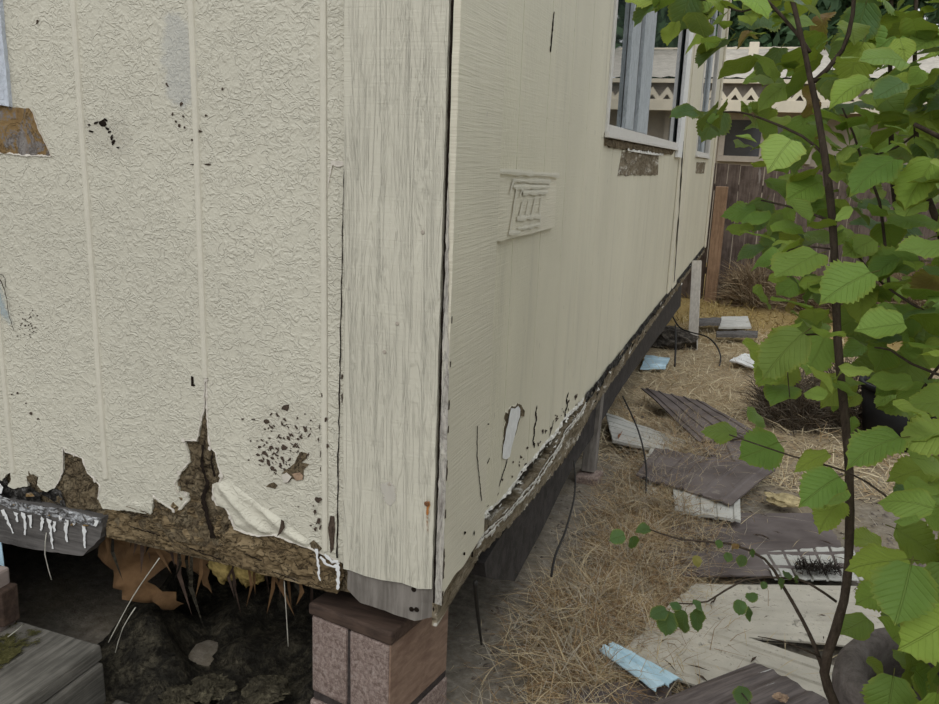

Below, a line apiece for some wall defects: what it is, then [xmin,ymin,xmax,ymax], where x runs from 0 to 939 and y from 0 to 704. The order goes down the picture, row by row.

peeling [0,105,51,157]
peeling [88,118,119,148]
spalling [50,447,102,510]
spalling [144,376,586,627]